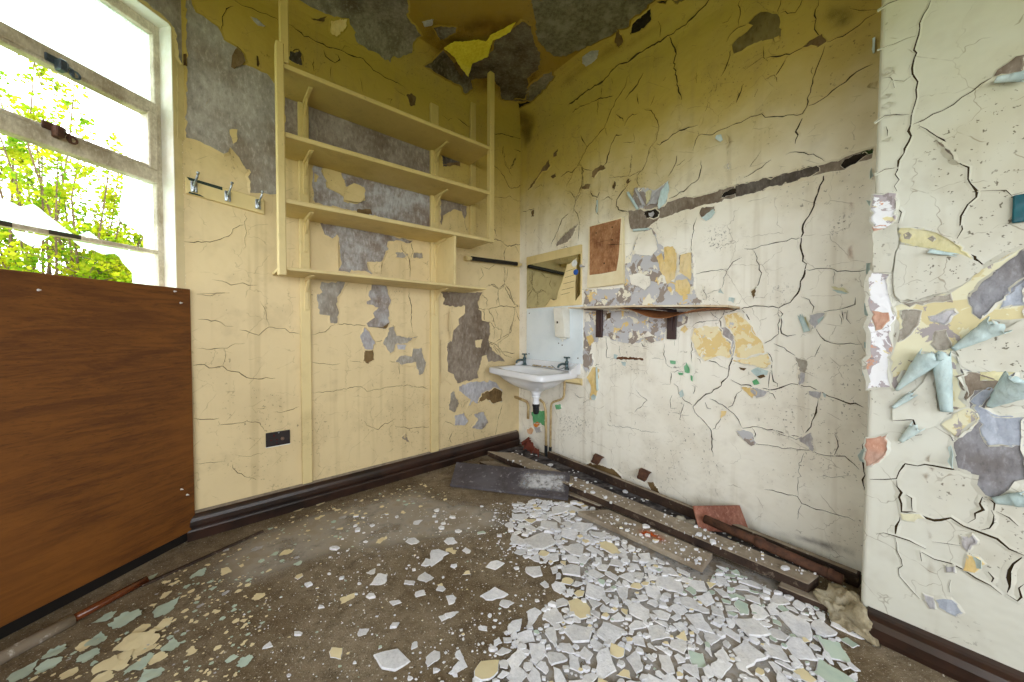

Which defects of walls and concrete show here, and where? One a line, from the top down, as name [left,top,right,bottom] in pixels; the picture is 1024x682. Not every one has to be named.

peeling [140,0,460,197]
peeling [297,0,684,109]
peeling [714,0,804,91]
crack [184,212,247,249]
crack [193,279,334,380]
crack [194,360,417,480]
peeling [314,223,429,376]
peeling [310,165,468,232]
peeling [440,291,506,443]
peeling [573,67,897,420]
crack [479,0,1024,605]
peeling [858,191,1024,507]